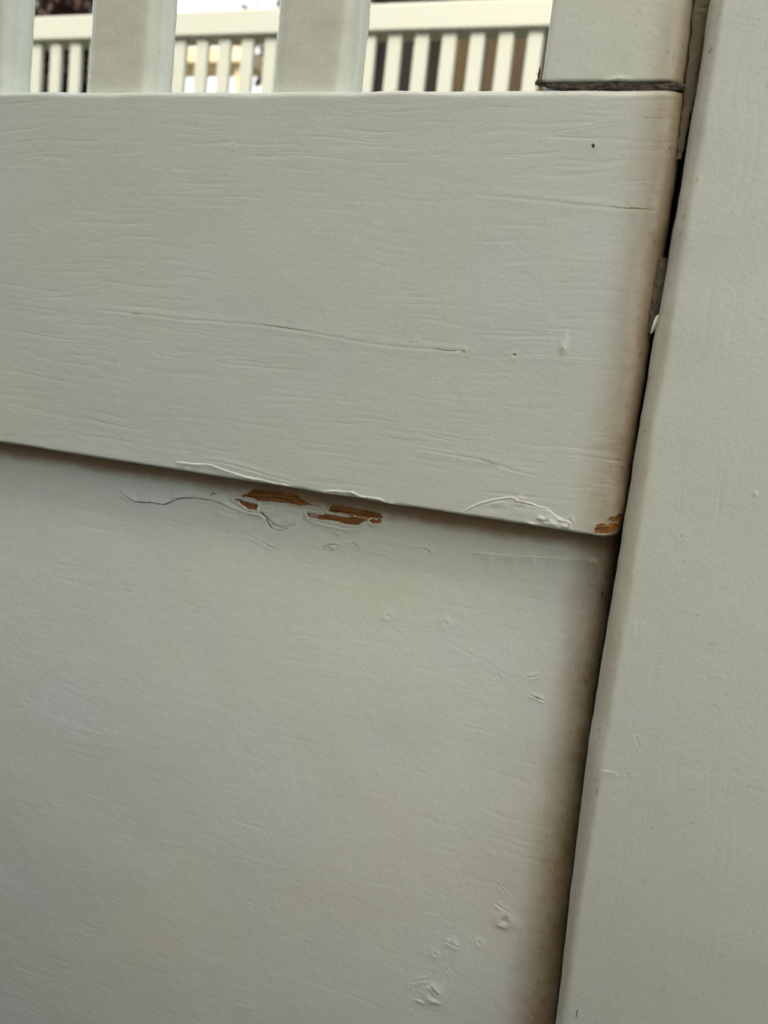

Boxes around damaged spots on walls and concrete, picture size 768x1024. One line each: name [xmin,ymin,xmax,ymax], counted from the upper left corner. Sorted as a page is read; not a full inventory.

crack [118,476,244,518]
peeling [174,454,408,541]
peeling [460,490,625,537]